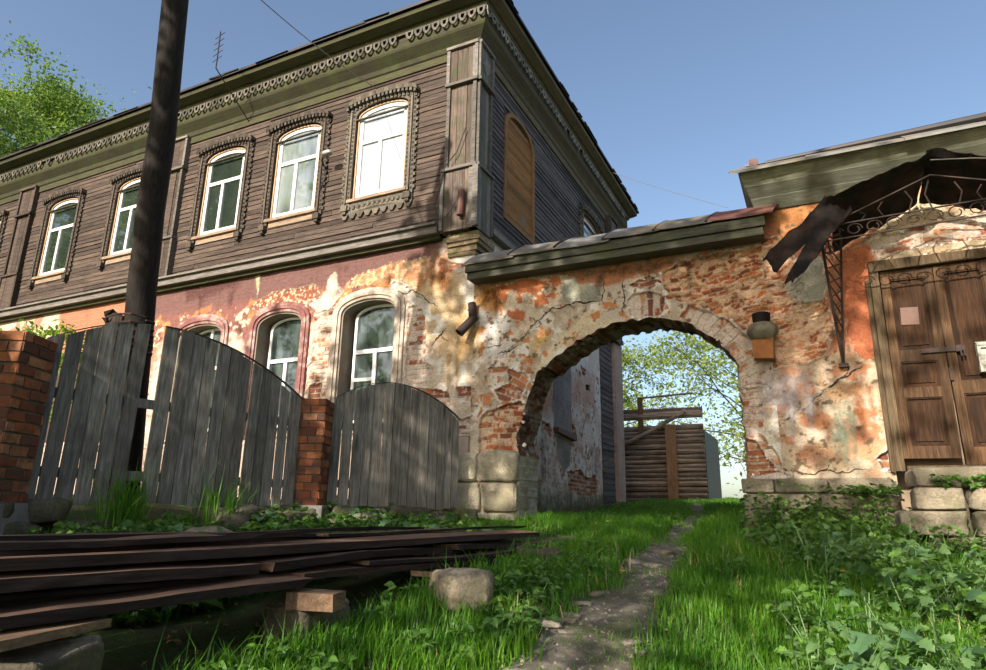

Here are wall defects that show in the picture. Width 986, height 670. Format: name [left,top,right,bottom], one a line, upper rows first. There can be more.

flaking render [255,257,471,405]
peeling [494,276,562,321]
crack [486,276,627,354]
spalling [627,215,986,479]
spalling [454,366,528,454]
water stain [767,375,814,418]
spalling [567,469,598,498]